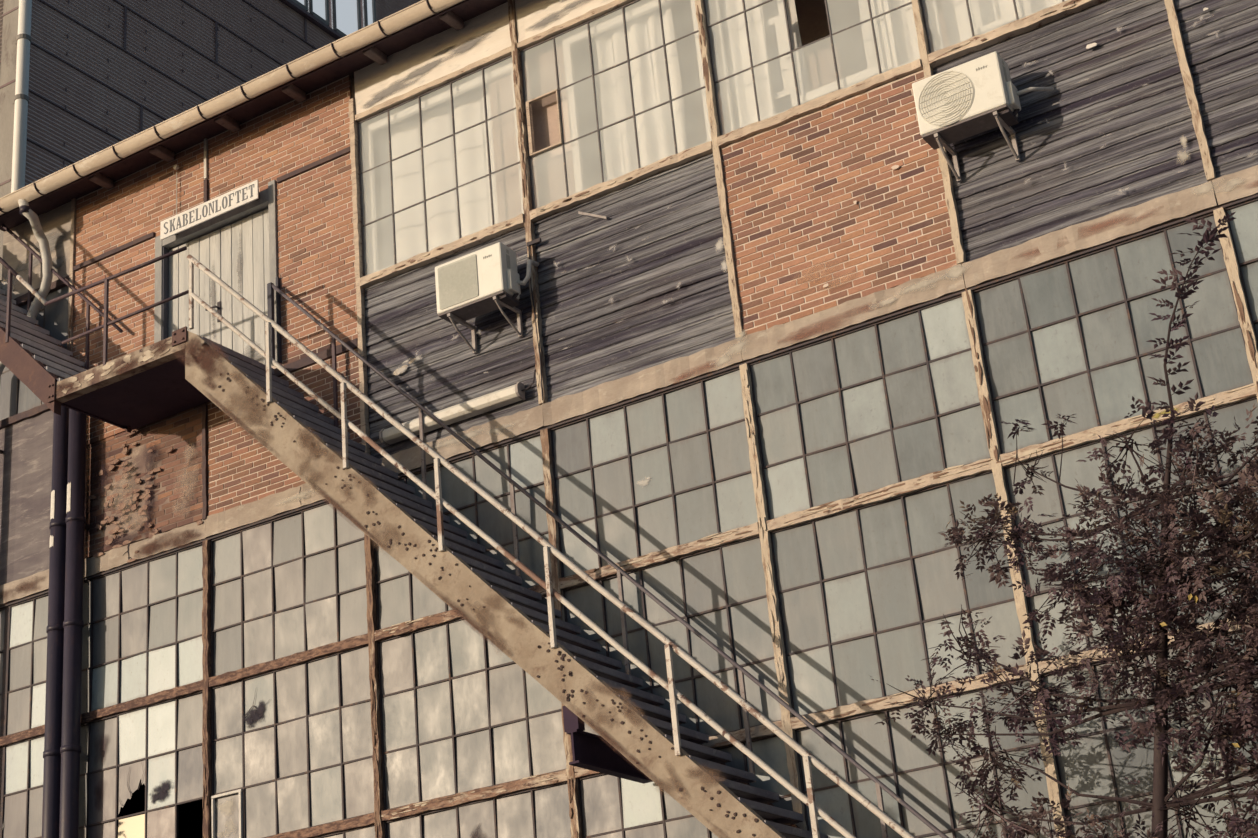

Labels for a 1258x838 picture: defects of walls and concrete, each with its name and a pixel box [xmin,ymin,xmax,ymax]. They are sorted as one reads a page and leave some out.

spalling [88,430,174,562]